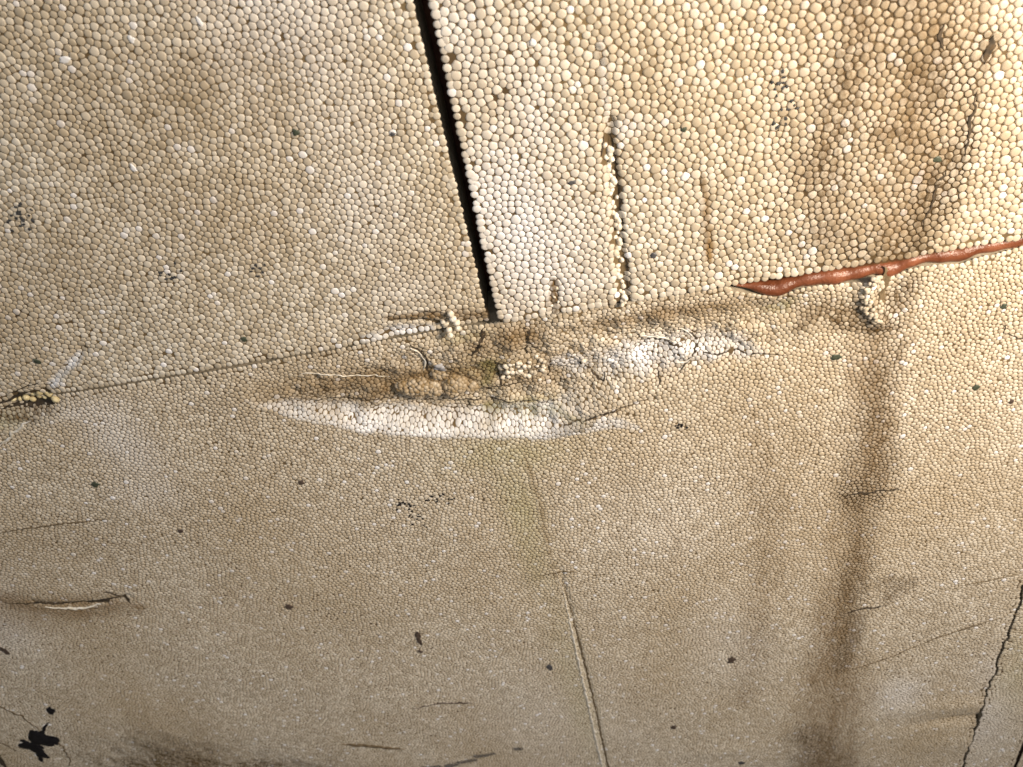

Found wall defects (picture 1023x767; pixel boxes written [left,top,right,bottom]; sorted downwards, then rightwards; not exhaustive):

damp [936,11,946,50]
damp [983,35,996,64]
damp [814,118,844,209]
damp [922,159,949,237]
damp [964,91,978,159]
damp [832,214,899,332]
crack [273,327,791,428]
crack [5,591,138,613]